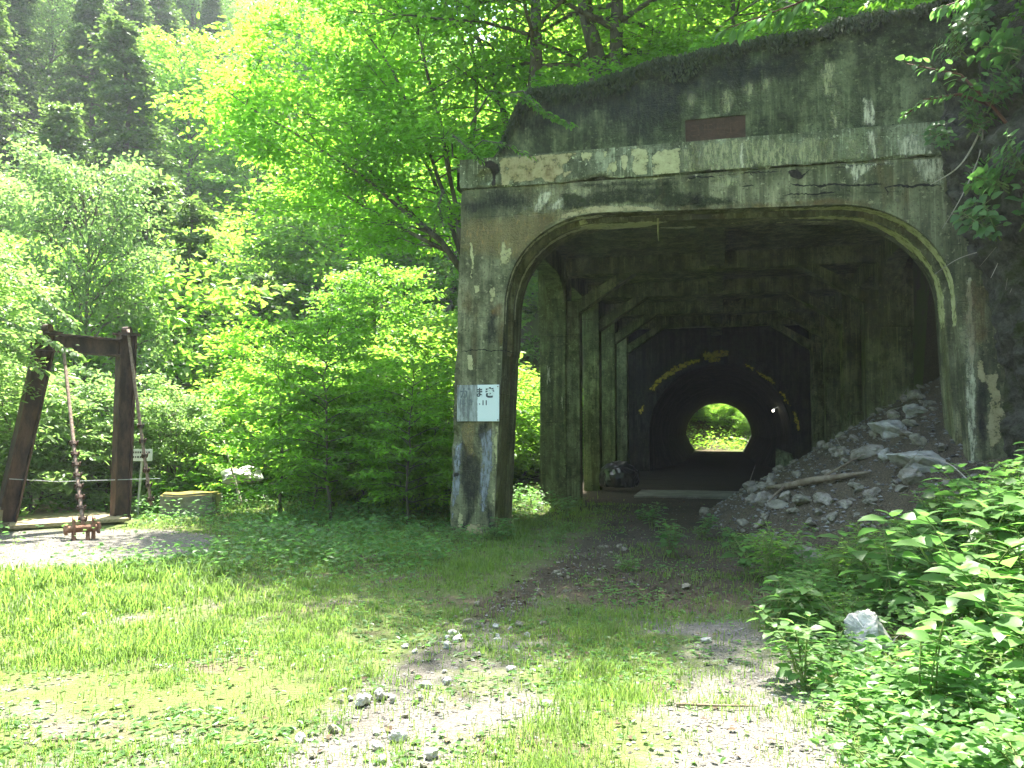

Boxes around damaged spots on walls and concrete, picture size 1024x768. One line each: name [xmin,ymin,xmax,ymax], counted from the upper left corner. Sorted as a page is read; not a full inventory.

water stain [521,57,798,143]
water stain [823,63,837,96]
water stain [863,99,876,159]
peeling [482,137,834,187]
crack [736,157,941,196]
peeling [764,206,1005,463]
water stain [461,442,479,528]